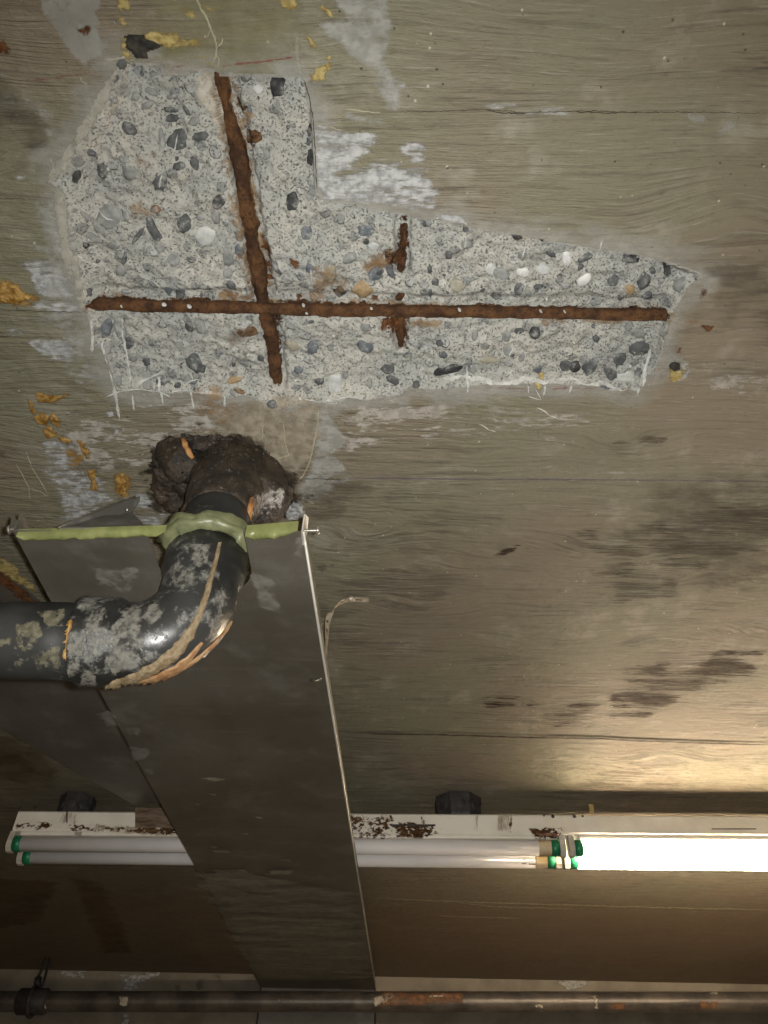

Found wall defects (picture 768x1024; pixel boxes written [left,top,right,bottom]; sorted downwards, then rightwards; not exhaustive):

spalling [51,34,703,471]
rust [85,70,670,386]
water stain [312,126,467,225]
peeling [710,370,765,394]
water stain [196,397,347,520]